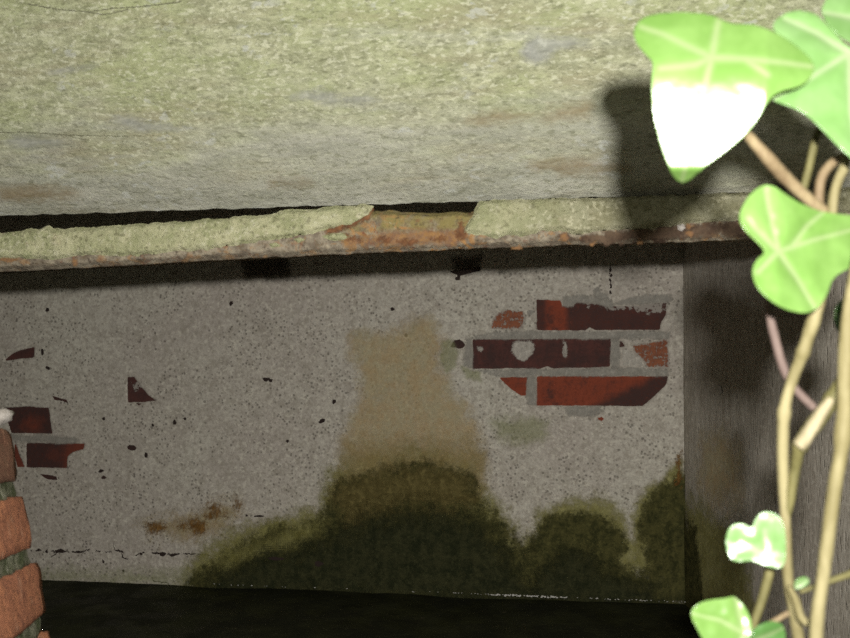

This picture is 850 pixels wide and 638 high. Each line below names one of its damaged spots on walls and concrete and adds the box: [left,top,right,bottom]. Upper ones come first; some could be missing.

rust [558,221,746,246]
flaking render [6,347,44,361]
flaking render [451,294,671,421]
flaking render [127,377,155,405]
damp [345,324,480,494]
flaking render [6,406,85,480]
rust [177,502,228,534]
crack [31,545,210,572]